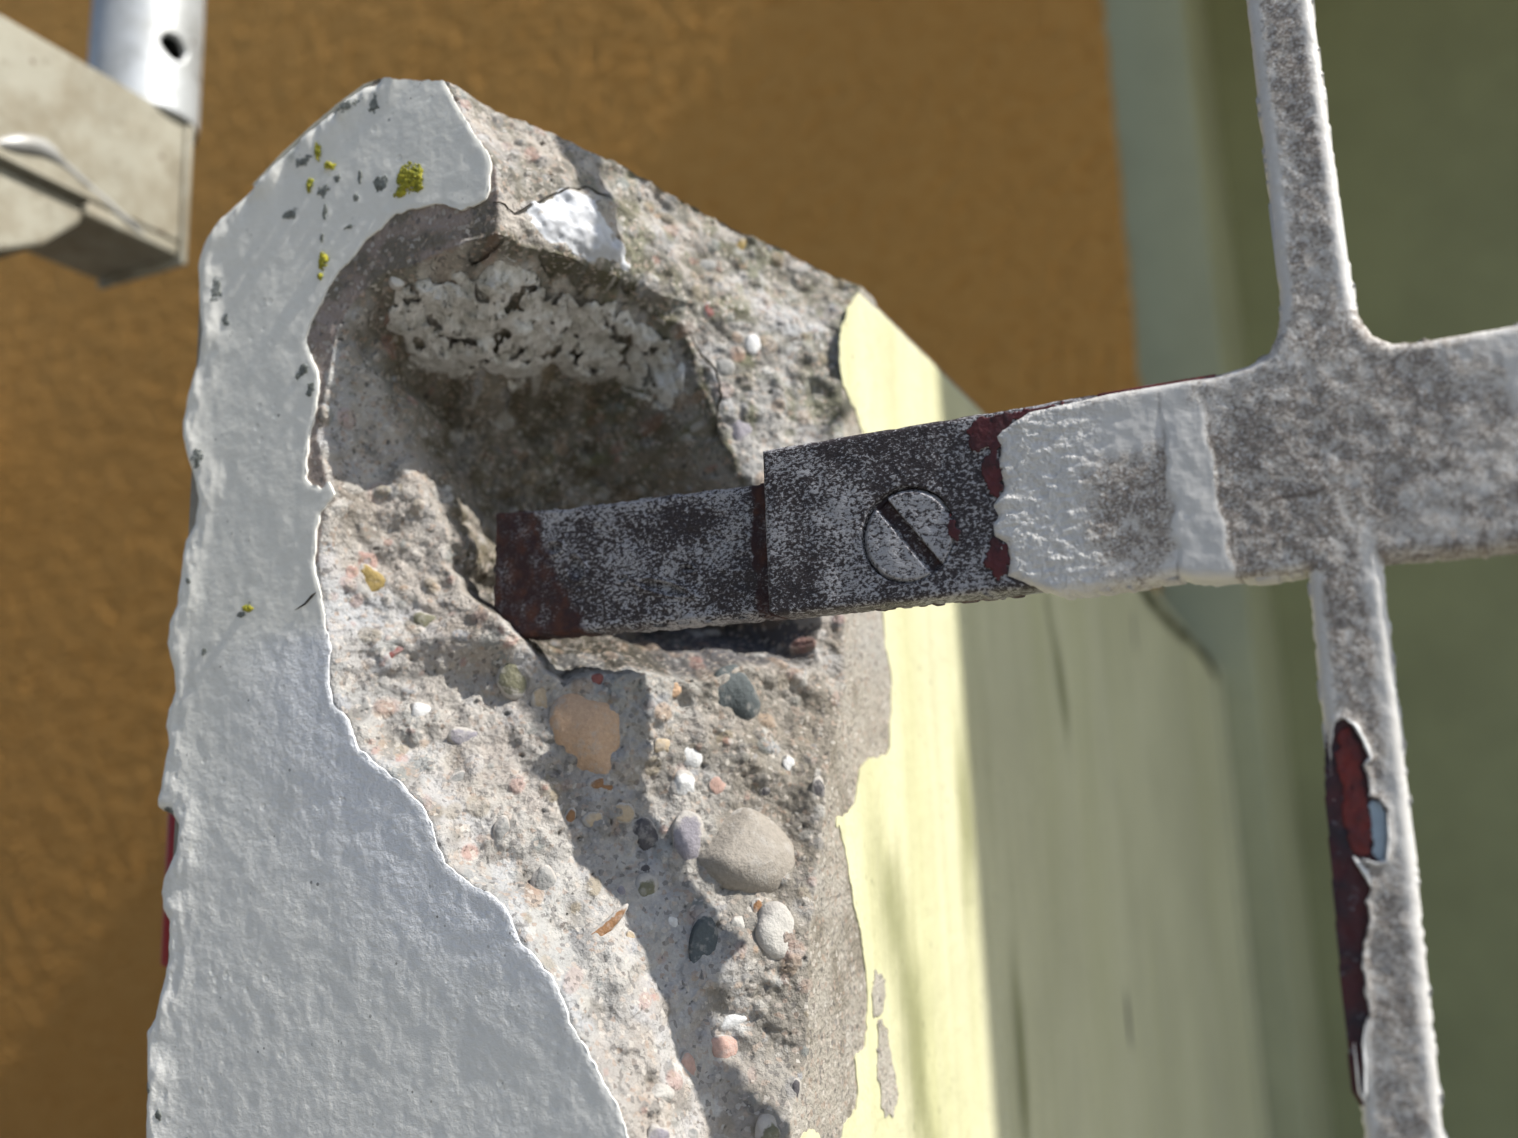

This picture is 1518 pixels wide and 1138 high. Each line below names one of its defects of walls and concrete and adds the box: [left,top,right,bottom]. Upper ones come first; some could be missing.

spalling [307,81,899,1138]